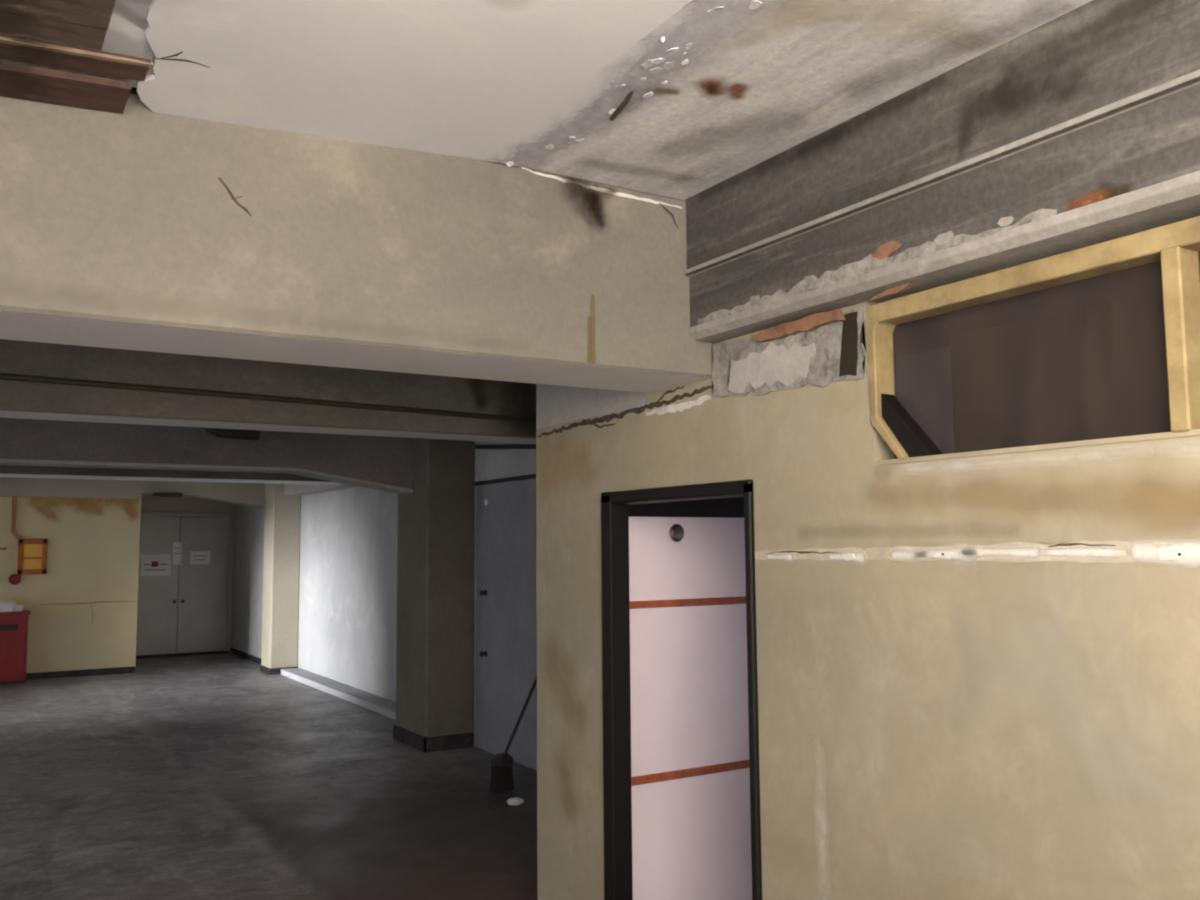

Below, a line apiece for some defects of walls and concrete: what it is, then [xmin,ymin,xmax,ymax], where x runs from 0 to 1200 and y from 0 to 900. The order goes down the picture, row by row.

rust [701,80,746,99]
spalling [698,209,1057,325]
spalling [712,282,915,398]
peeling [755,541,1200,564]